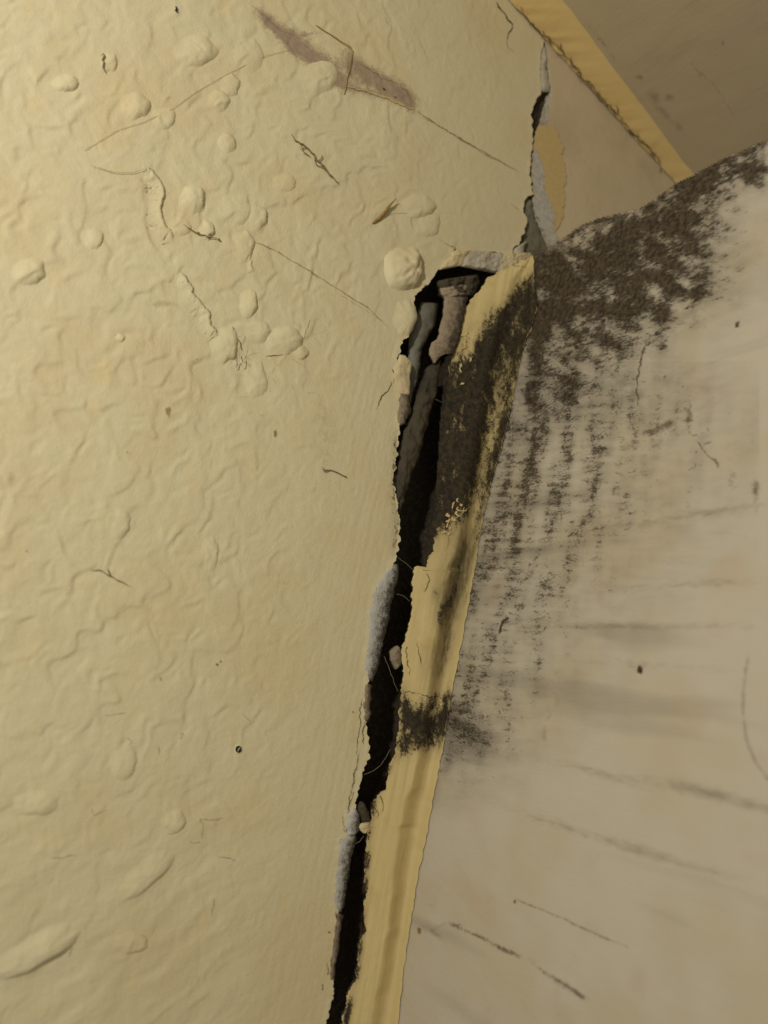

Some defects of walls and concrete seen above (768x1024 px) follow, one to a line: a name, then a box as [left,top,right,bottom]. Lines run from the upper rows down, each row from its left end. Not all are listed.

peeling [532,125,567,246]
crack [377,198,548,515]
damp [385,142,768,775]
crack [322,563,436,990]
damp [343,997,353,1024]